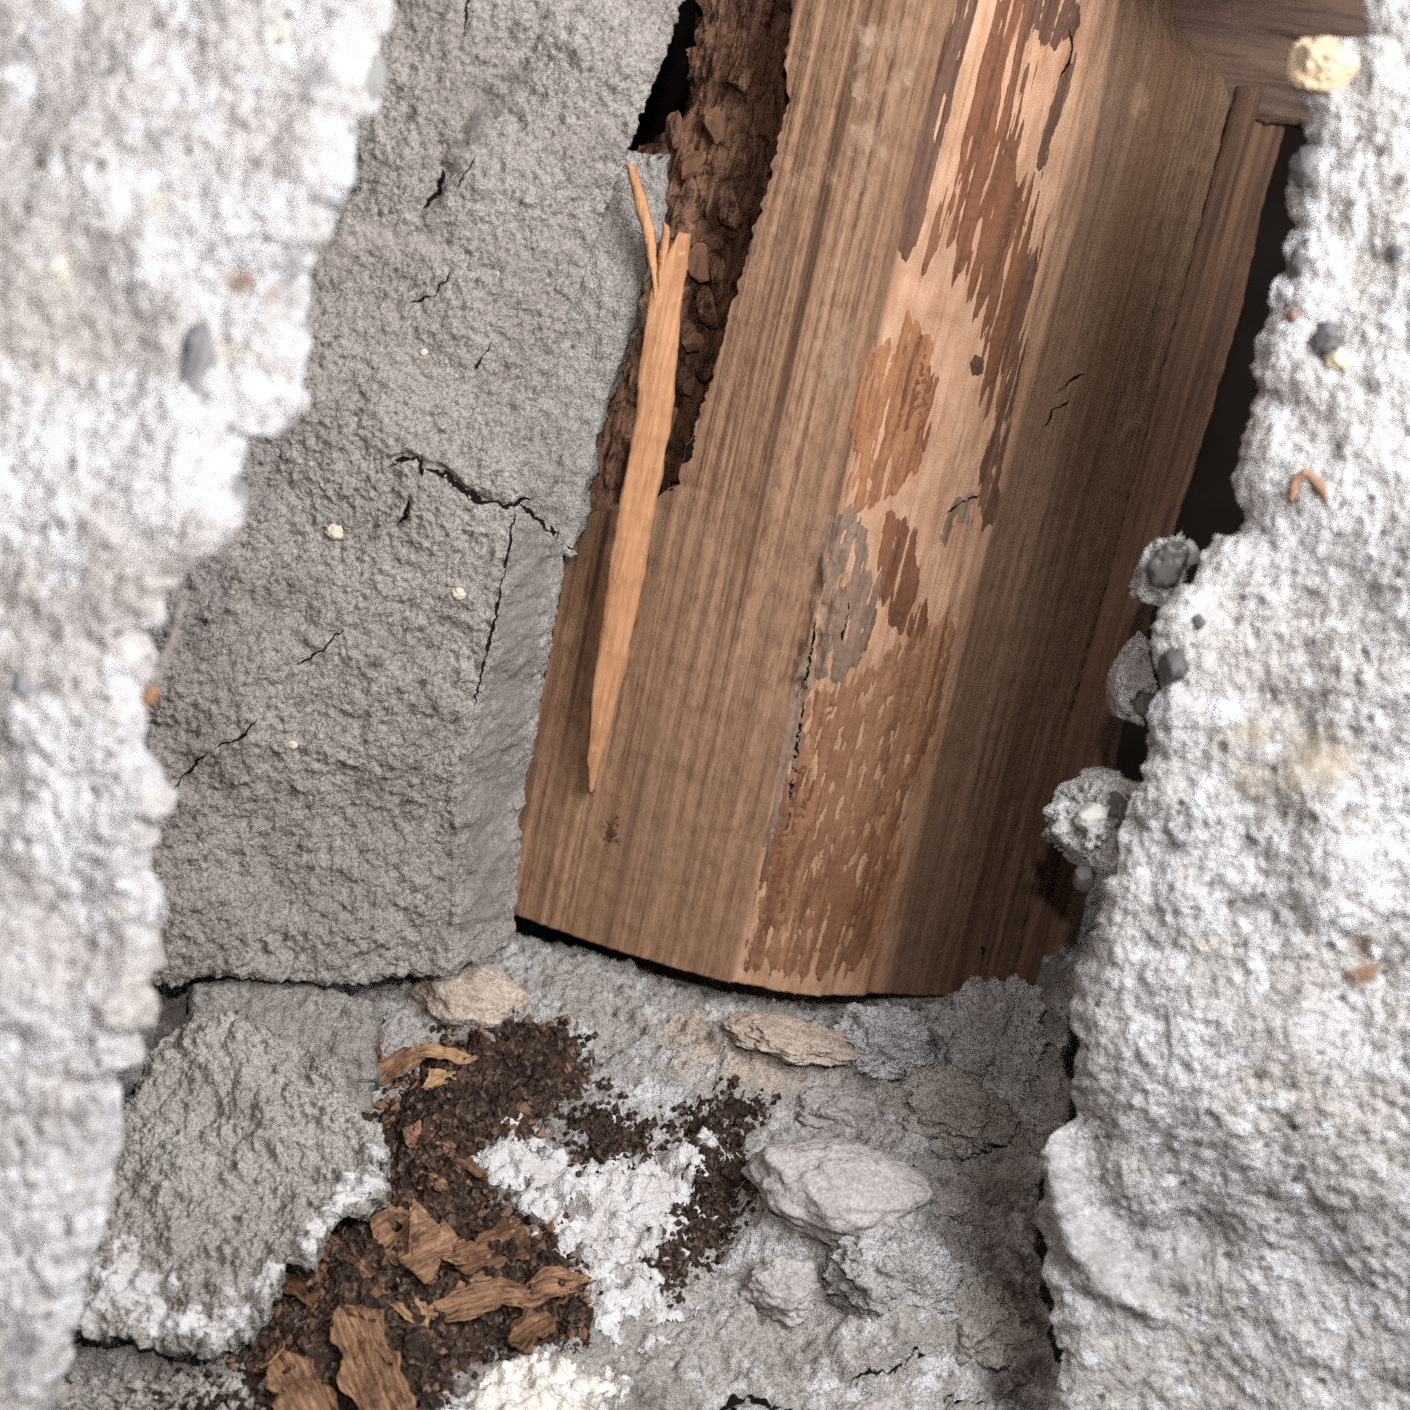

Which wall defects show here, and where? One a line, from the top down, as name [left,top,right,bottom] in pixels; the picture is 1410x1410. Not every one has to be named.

crack [411,271,450,303]
crack [297,630,343,665]
crack [173,718,258,789]